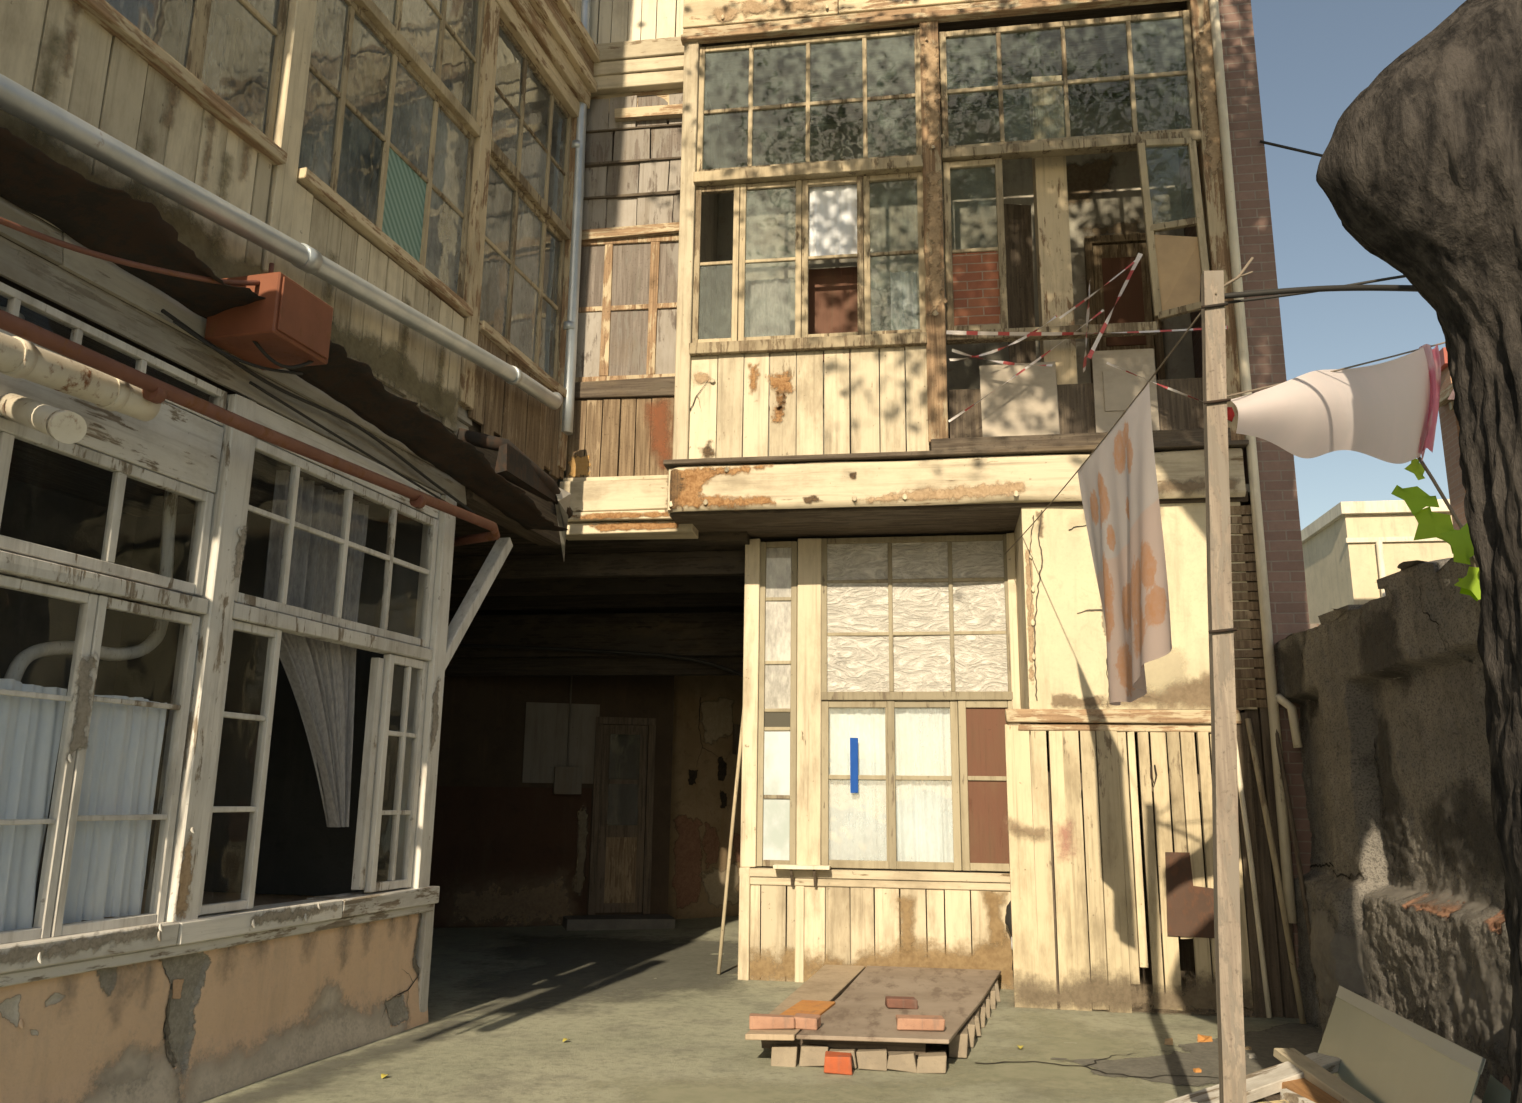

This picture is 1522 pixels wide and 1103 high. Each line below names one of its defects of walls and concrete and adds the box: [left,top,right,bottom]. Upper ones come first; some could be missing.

peeling [713,0,829,22]
peeling [850,472,1025,503]
crack [1029,510,1086,701]
peeling [66,653,99,762]
peeling [702,822,741,908]
damp [1429,788,1504,880]
spalling [0,827,211,1074]
peeling [251,902,340,928]
spalling [413,913,421,981]
spalling [386,994,409,1026]